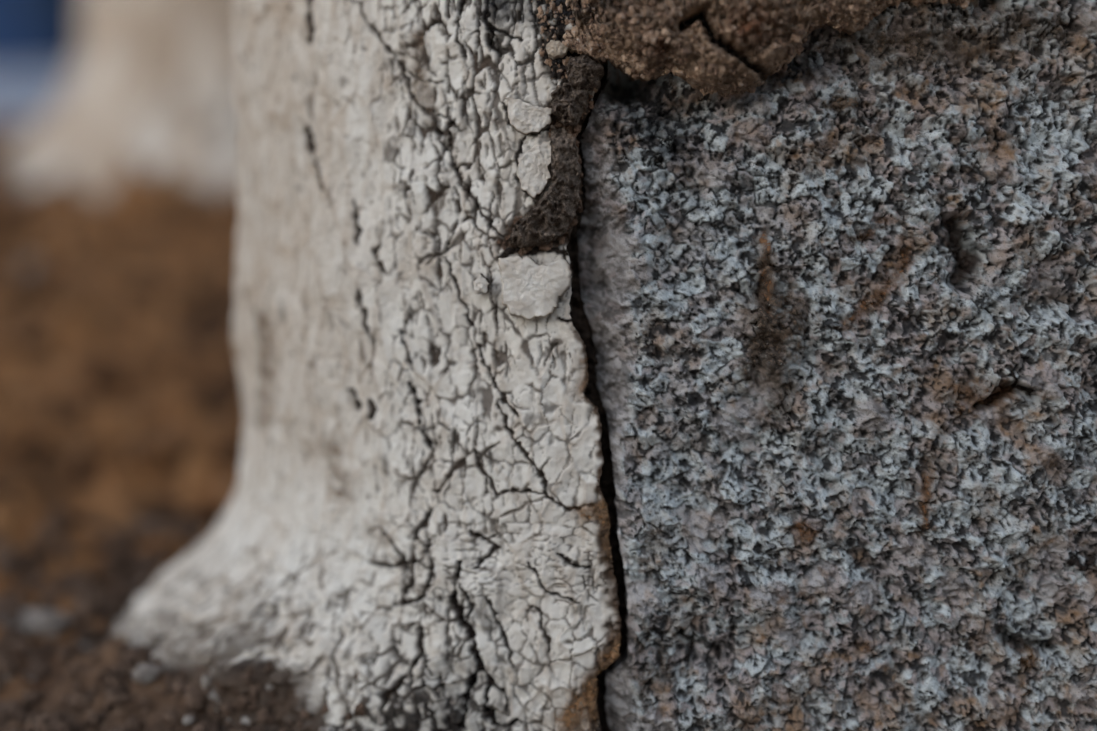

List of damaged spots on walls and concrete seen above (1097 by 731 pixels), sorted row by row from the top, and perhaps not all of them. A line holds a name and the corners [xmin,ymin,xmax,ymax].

crack [307,0,315,43]
crack [307,127,324,190]
spalling [473,0,604,321]
crack [350,0,628,731]